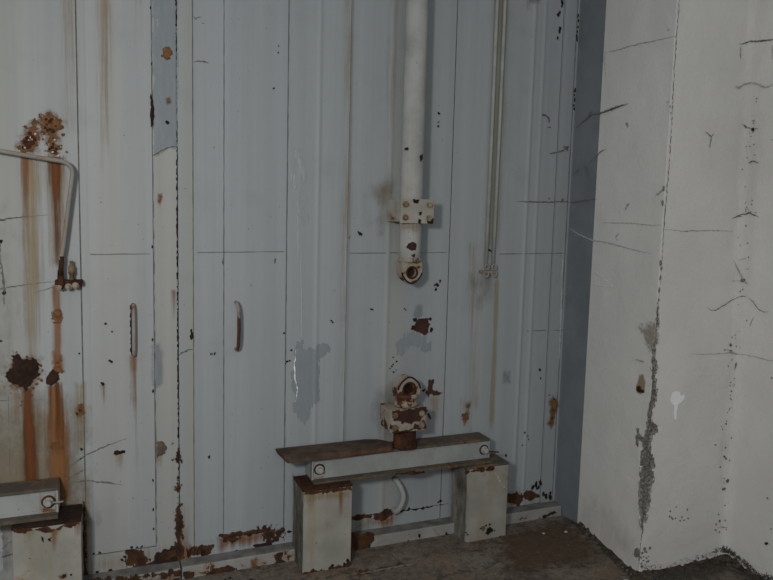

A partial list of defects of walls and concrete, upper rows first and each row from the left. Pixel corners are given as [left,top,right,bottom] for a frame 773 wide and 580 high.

rust [161,0,178,60]
rust [13,98,292,580]
peeling [285,255,331,425]
rust [389,407,428,433]
peeling [389,306,433,373]
spalling [633,303,660,569]